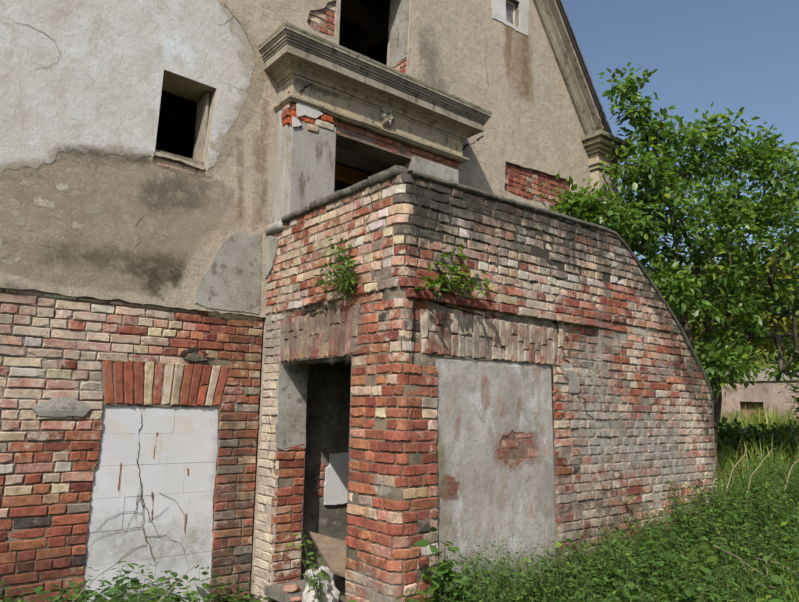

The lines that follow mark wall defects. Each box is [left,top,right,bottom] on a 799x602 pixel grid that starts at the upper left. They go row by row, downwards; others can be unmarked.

flaking render [307,1,335,37]
flaking render [281,91,458,168]
flaking render [504,162,570,204]
flaking render [495,431,538,468]
crack [124,414,161,540]
spalling [440,475,459,499]